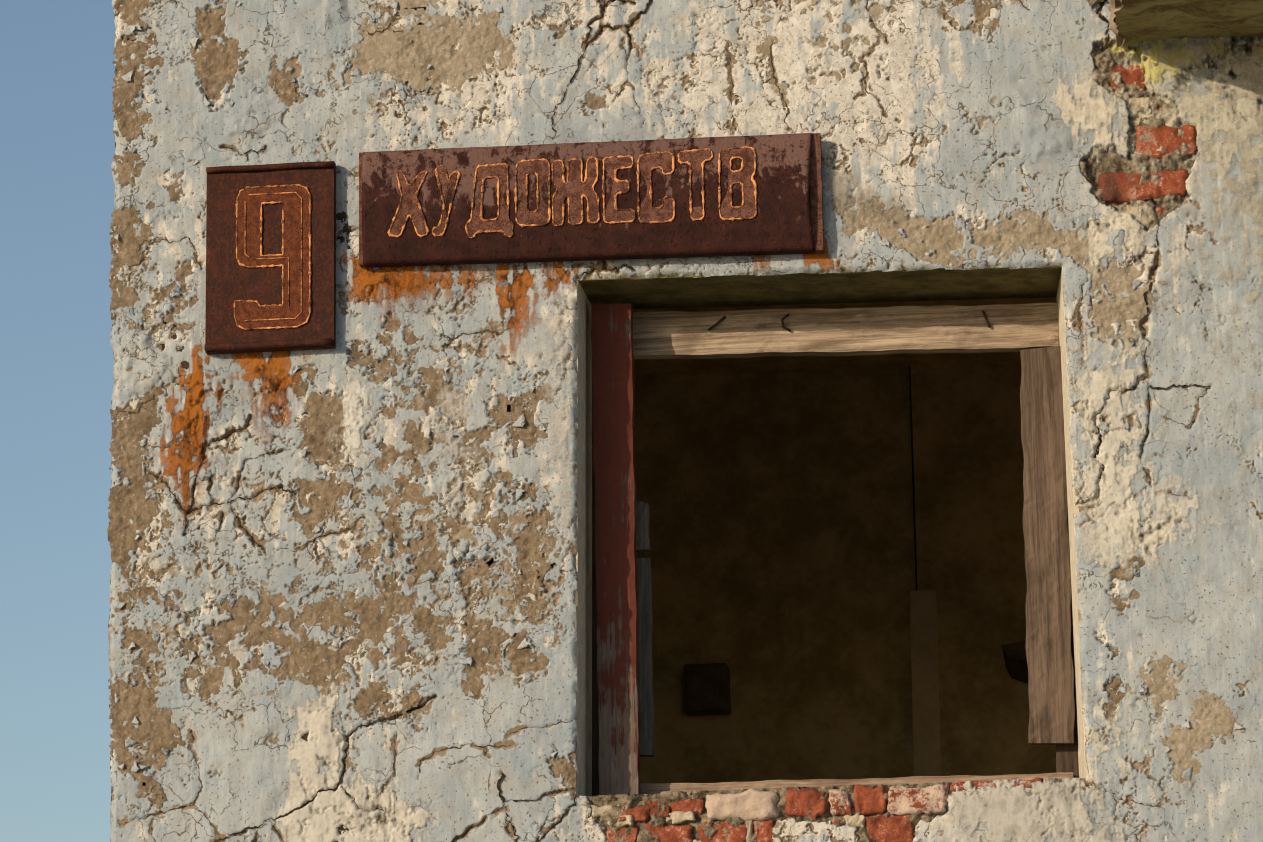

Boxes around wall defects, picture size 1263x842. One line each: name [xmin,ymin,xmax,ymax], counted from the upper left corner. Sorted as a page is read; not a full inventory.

peeling [342,0,519,97]
crack [551,0,653,139]
crack [726,40,790,130]
flaking render [831,43,1199,353]
rust [160,345,222,507]
rust [232,351,304,424]
rust [343,255,476,301]
rust [495,261,580,350]
crack [1080,216,1211,508]
peeling [107,312,562,808]
crack [117,696,577,842]
flaking render [547,741,1082,842]